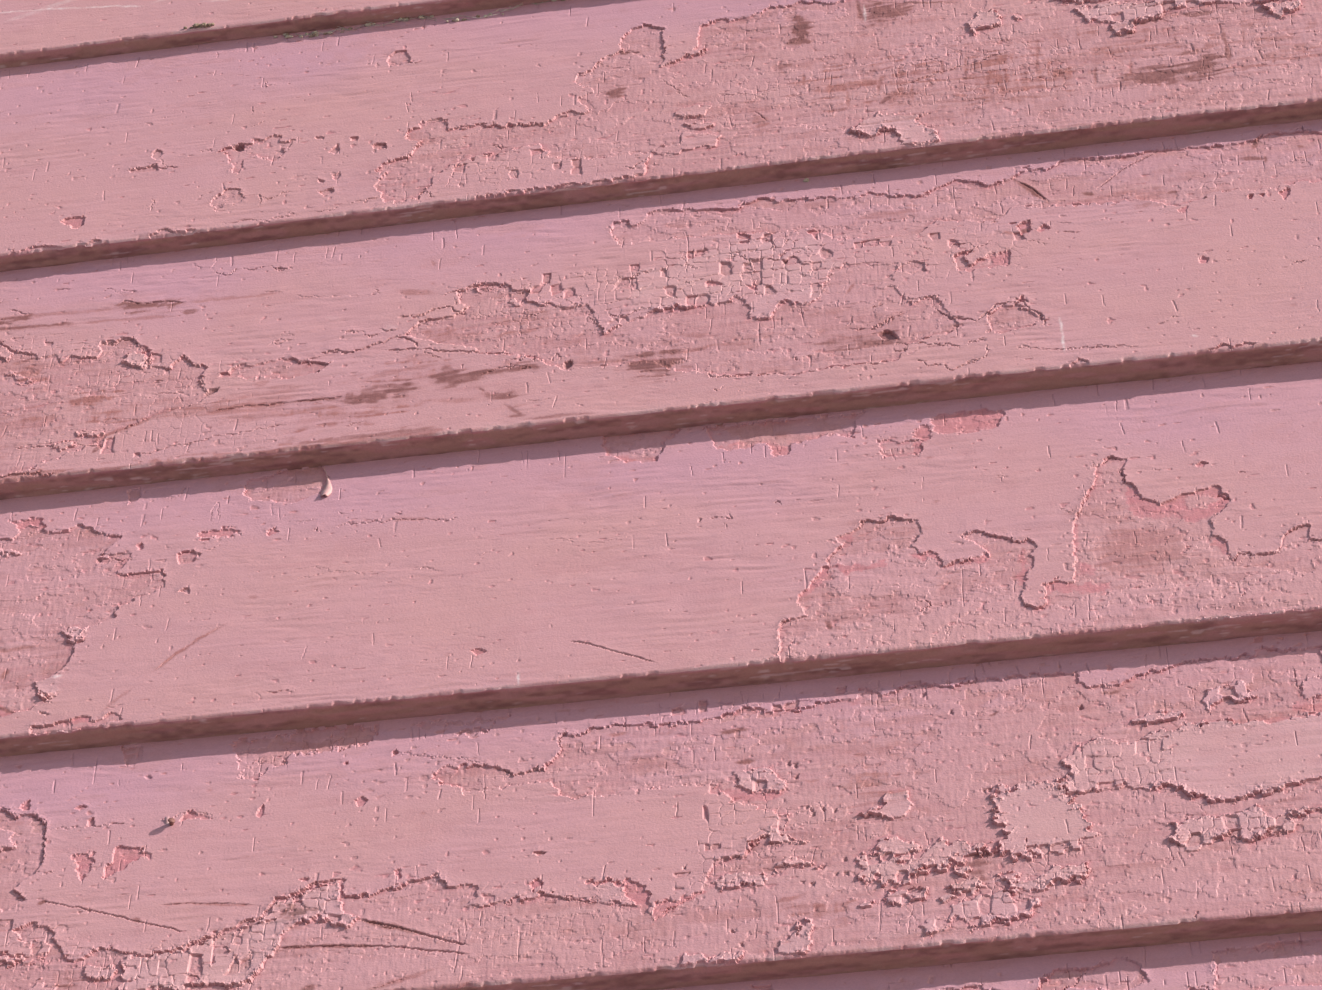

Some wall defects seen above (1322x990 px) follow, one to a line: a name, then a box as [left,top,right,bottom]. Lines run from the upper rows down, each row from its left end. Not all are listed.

peeling [315,0,1322,204]
peeling [381,130,1322,378]
peeling [0,333,443,484]
peeling [0,501,245,737]
peeling [776,454,1322,662]
peeling [0,644,1322,990]